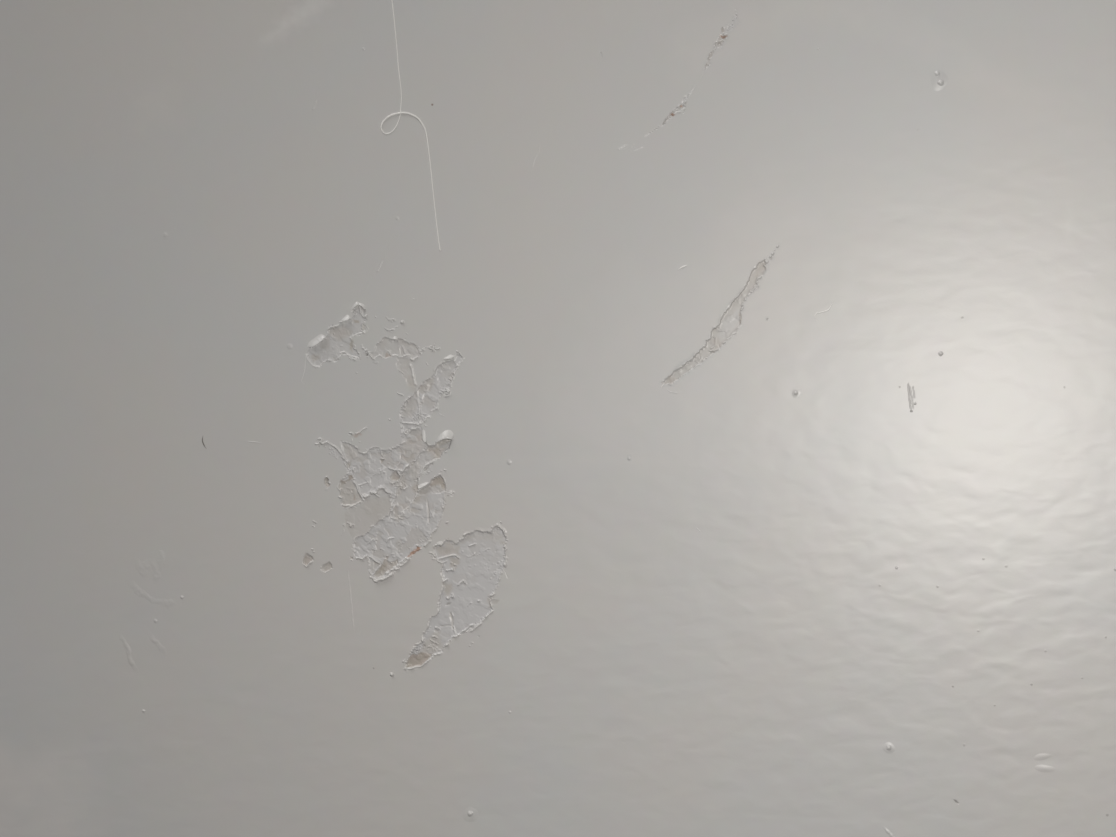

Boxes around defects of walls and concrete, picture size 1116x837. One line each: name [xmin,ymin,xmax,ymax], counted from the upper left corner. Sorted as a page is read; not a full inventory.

peeling [305,302,369,368]
spalling [661,245,779,385]
peeling [314,350,465,583]